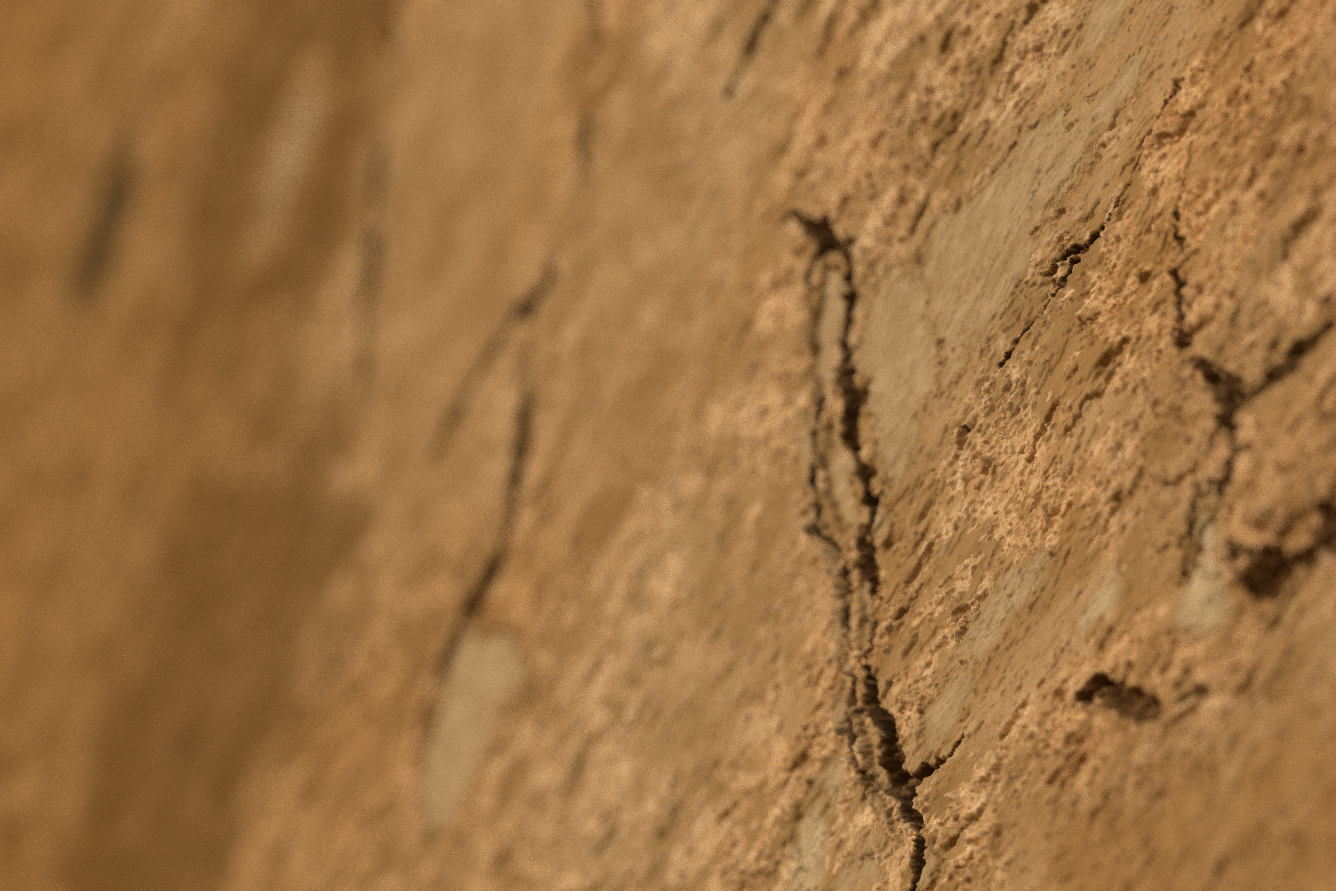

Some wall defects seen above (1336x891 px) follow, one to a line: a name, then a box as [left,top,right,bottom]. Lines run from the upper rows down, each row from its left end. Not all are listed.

crack [577,91,593,185]
crack [416,367,534,746]
spalling [415,599,539,846]
crack [433,221,572,460]
crack [782,208,962,891]
crack [1167,142,1336,603]